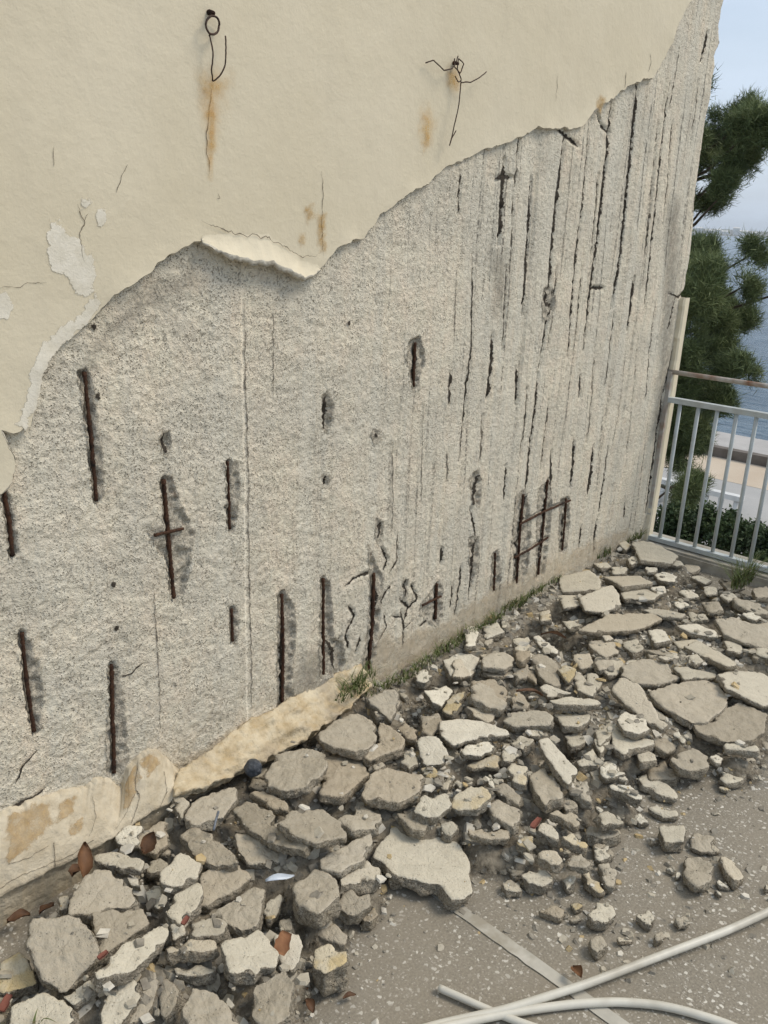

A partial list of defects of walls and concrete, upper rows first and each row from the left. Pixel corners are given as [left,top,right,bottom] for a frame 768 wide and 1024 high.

crack [244,304,253,715]
peeling [0,0,723,812]
crack [328,440,476,653]
crack [421,32,707,555]